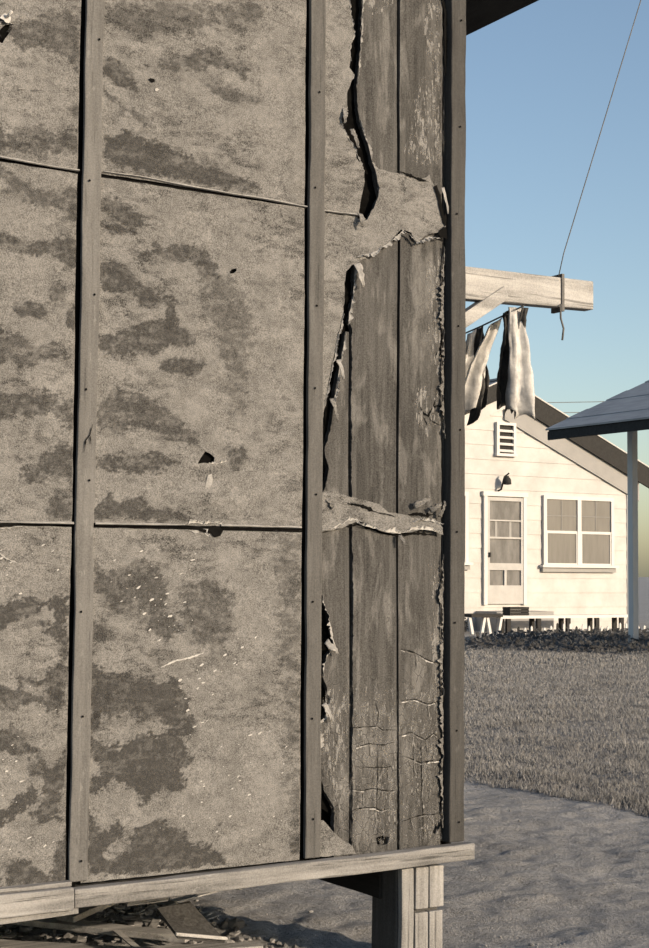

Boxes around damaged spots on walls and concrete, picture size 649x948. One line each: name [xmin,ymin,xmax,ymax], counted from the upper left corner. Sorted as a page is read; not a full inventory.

peeling [404,0,441,165]
leakage [105,128,259,192]
leakage [98,259,204,376]
peeling [426,254,442,375]
peeling [416,387,444,437]
leakage [95,493,198,524]
leakage [0,593,69,828]
leakage [89,662,197,806]
peeling [323,568,442,840]
crack [348,699,440,840]
crack [402,649,440,667]
leakage [88,816,225,876]